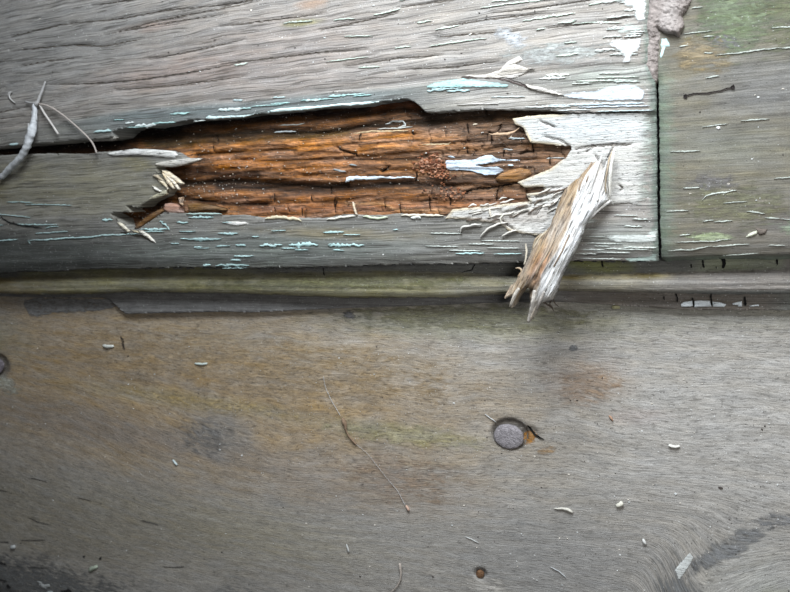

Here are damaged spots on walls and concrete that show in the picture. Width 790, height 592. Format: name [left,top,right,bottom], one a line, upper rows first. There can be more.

crack [0,0,635,90]
peeling [524,0,646,62]
spalling [0,72,657,269]
peeling [703,190,790,220]
peeling [670,234,757,256]